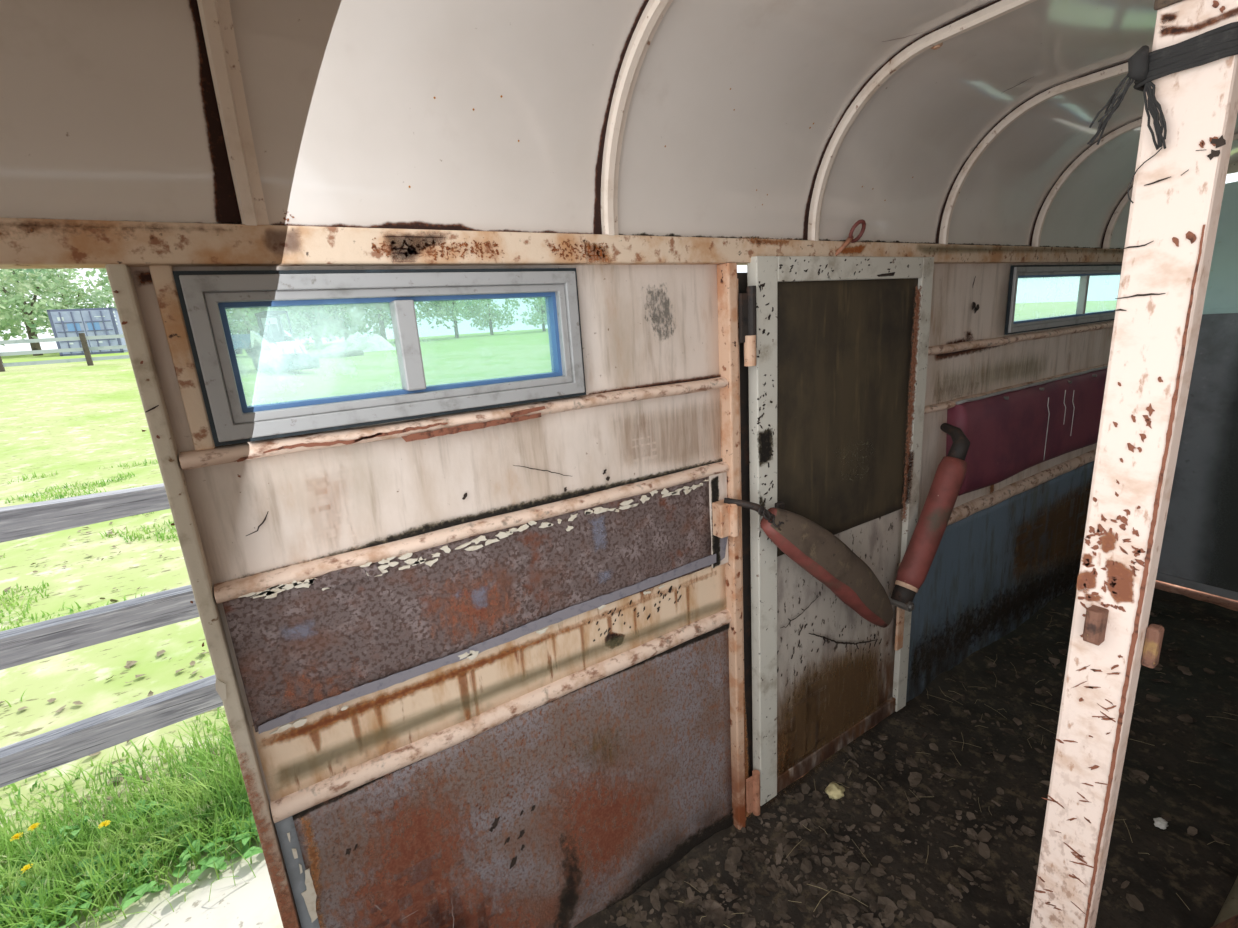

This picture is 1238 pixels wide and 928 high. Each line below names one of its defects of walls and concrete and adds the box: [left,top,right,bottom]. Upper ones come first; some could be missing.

corrosion [547,0,649,263]
corrosion [371,232,505,263]
corrosion [835,245,865,254]
peeling [238,479,710,599]
peeling [258,537,728,734]
corrosion [1076,224,1206,928]
corrosion [236,751,298,928]
corrosion [264,622,730,928]